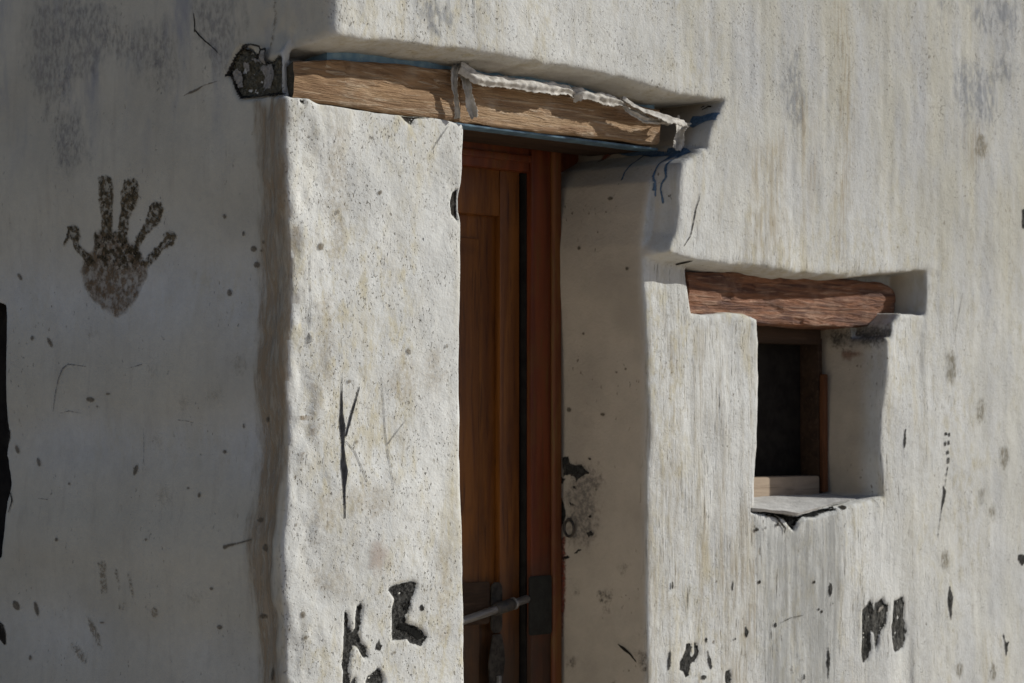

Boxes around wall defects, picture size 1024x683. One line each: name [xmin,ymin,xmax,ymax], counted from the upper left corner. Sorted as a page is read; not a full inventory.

crack [193,13,218,53]
spalling [225,43,287,99]
spalling [342,581,427,683]
spalling [668,637,712,680]
spalling [861,597,907,663]